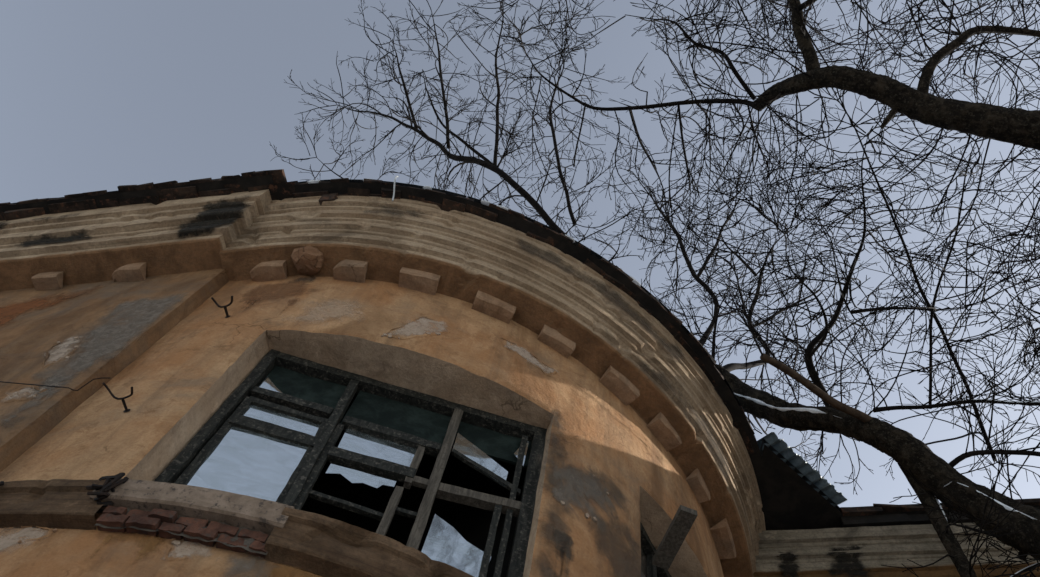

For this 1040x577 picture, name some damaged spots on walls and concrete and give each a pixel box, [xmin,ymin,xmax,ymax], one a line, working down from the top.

peeling [498,338,557,377]
peeling [0,526,57,550]
flaking render [95,505,270,562]